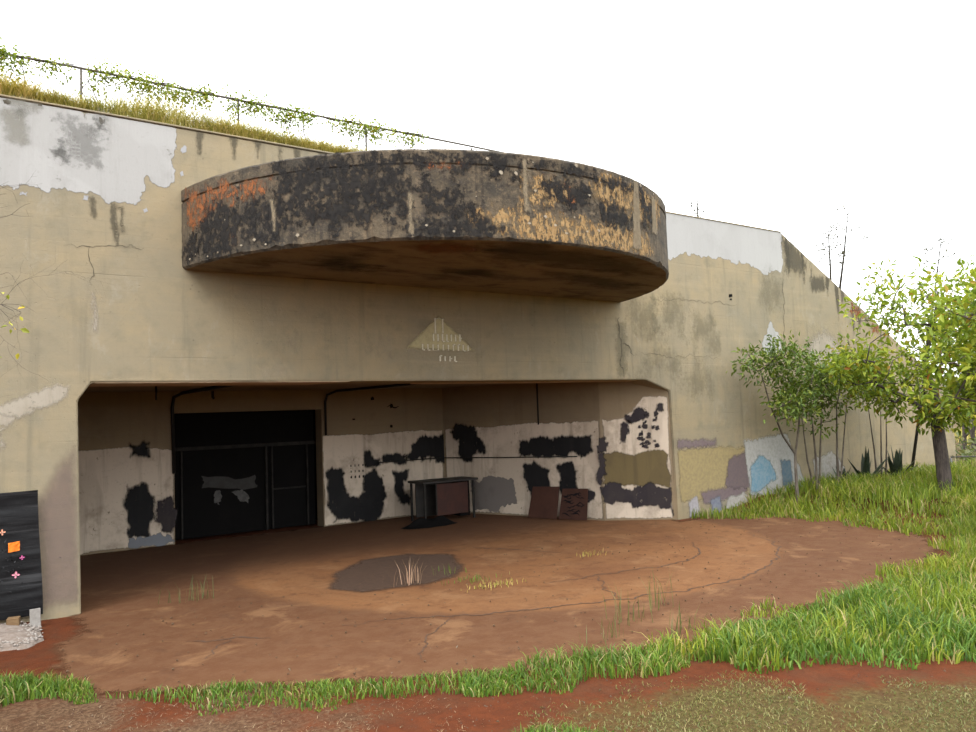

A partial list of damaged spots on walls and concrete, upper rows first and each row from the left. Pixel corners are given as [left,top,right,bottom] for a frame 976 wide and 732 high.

peeling [0,98,187,213]
leakage [522,159,531,212]
peeling [467,170,783,275]
leakage [633,181,657,249]
leakage [782,237,867,329]
crack [617,319,719,373]